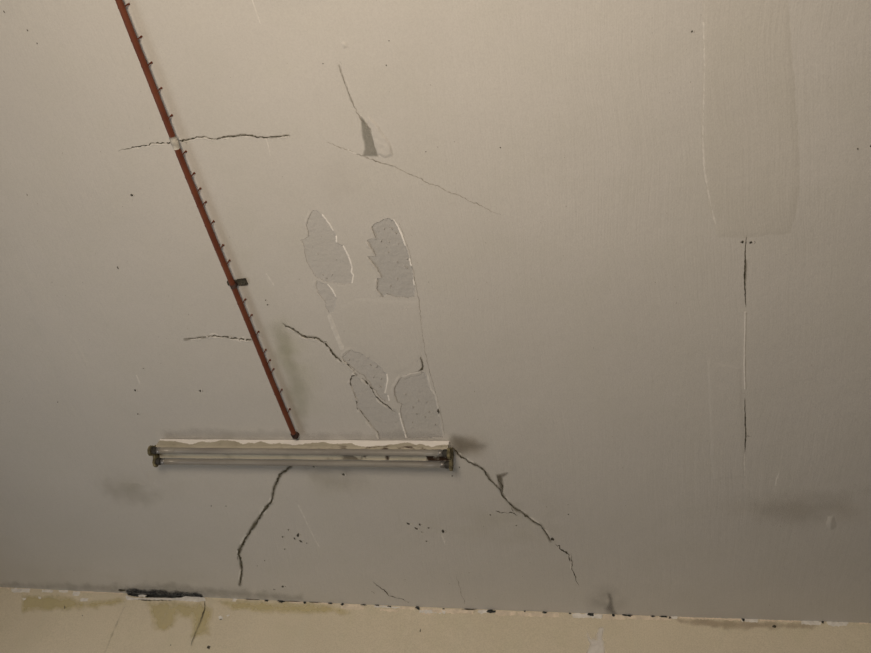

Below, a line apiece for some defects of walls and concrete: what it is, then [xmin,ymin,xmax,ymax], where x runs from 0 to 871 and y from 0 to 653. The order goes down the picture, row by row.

crack [124,134,289,150]
peeling [365,218,416,298]
crack [185,333,252,343]
crack [284,324,392,439]
peeling [347,371,444,439]
crack [742,244,750,477]
crack [236,466,292,585]
crack [454,449,579,585]
leakage [118,589,206,602]